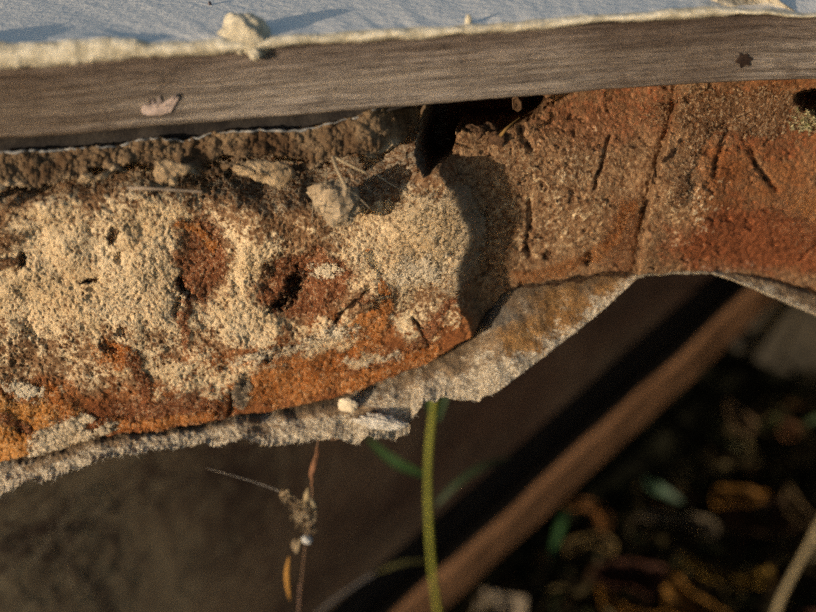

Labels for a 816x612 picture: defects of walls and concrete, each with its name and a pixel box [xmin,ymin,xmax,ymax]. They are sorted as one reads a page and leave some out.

peeling [0,104,428,191]
corrosion [166,206,236,350]
spalling [245,244,375,326]
corrosion [83,279,461,435]
corrosion [0,380,85,461]